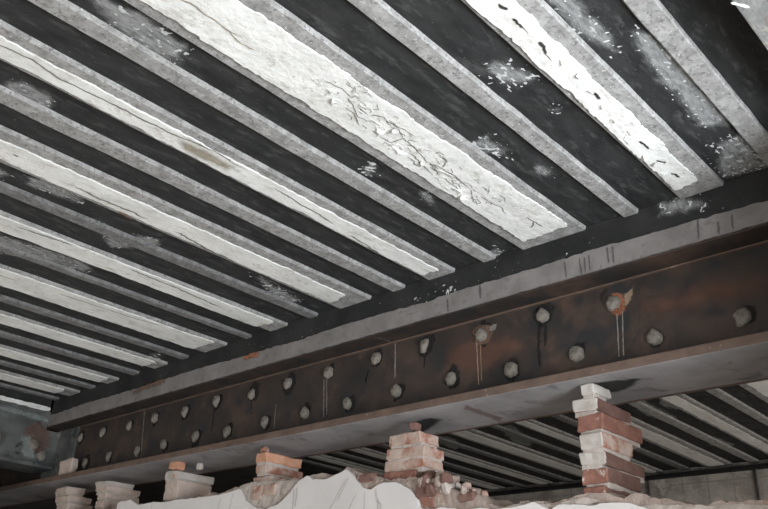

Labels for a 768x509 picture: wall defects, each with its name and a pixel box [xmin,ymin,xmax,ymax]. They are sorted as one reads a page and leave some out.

damp [109,6,189,64]
crack [181,0,254,50]
crack [498,4,522,28]
crack [0,45,238,166]
crack [314,81,506,214]
crack [276,189,333,224]
corrosion [600,289,633,356]
corrosion [472,324,496,385]